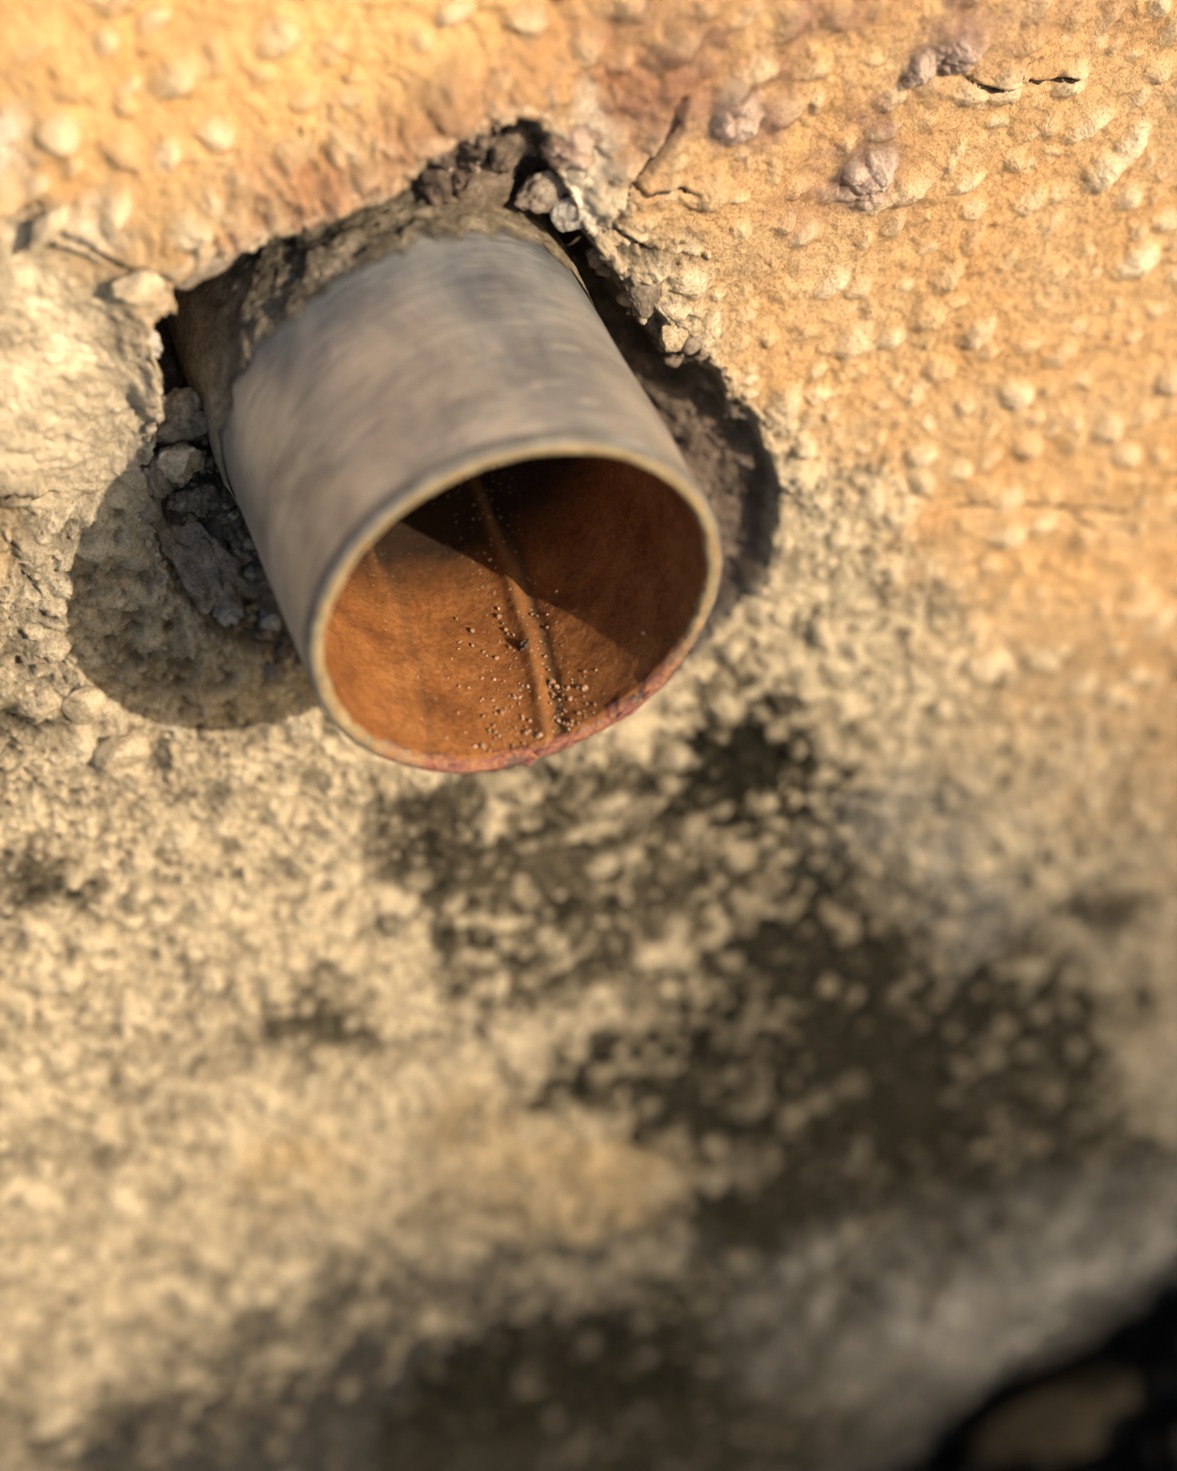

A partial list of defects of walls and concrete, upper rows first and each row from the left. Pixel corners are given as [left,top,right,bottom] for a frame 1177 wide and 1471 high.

spalling [0,104,793,718]
damp [13,667,1177,1471]